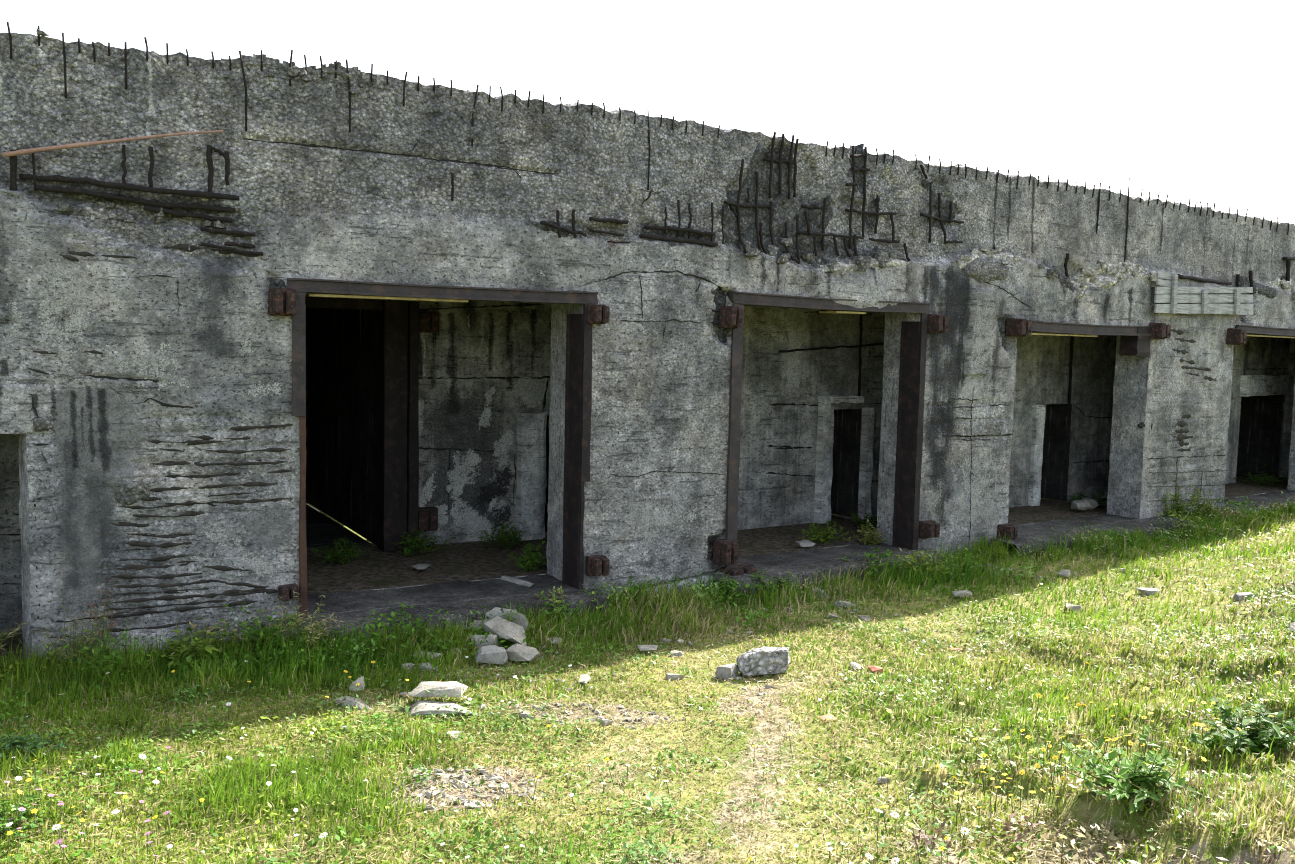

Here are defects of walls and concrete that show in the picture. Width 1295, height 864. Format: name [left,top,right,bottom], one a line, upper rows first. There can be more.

spalling [528,132,910,290]
spalling [918,164,1021,269]
spalling [711,287,731,346]
spalling [1038,253,1158,297]
spalling [1177,257,1295,304]
water stain [33,386,115,608]
peeling [419,386,517,539]